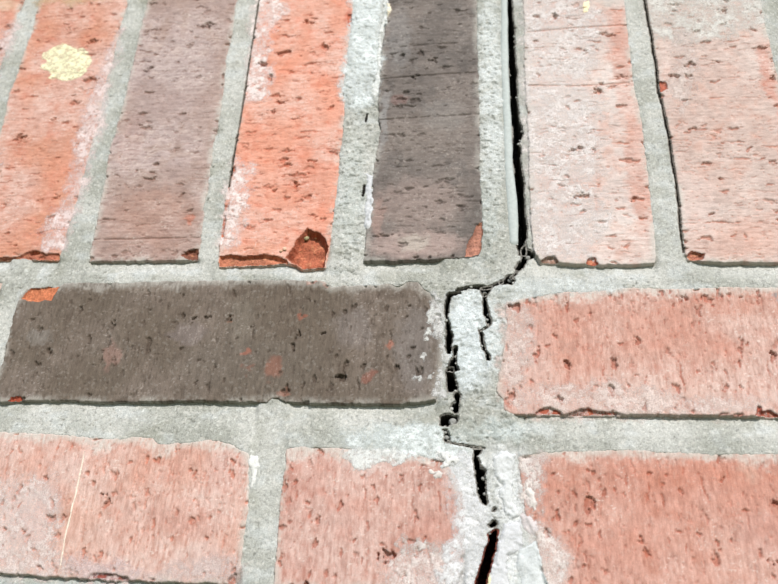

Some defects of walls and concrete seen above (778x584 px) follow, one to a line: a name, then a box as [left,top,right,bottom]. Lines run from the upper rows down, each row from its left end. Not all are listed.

spalling [21,287,59,302]
spalling [219,227,329,269]
crack [439,0,536,584]
water stain [342,423,488,584]
water stain [518,451,574,584]